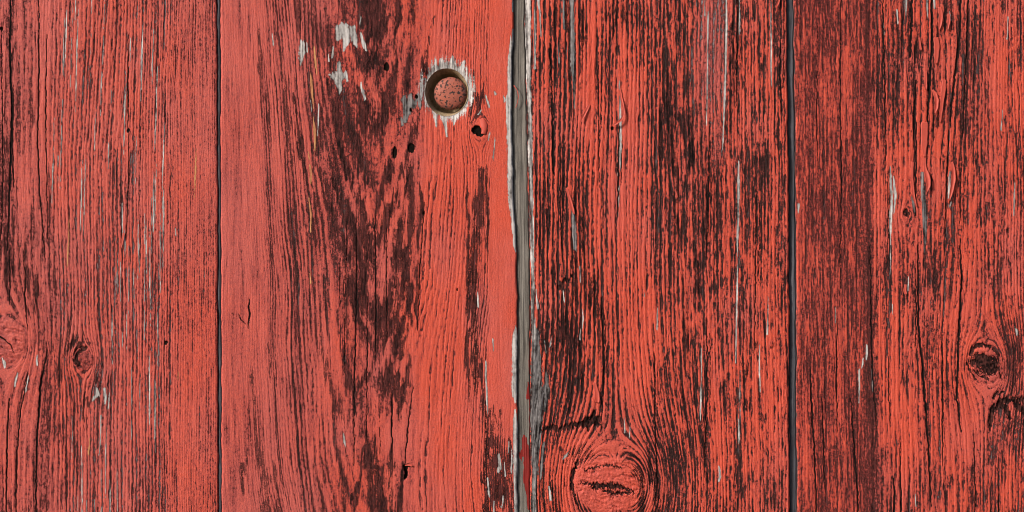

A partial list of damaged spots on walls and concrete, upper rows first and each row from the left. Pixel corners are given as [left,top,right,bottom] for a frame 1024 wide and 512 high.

peeling [298,17,367,184]
peeling [401,0,552,512]